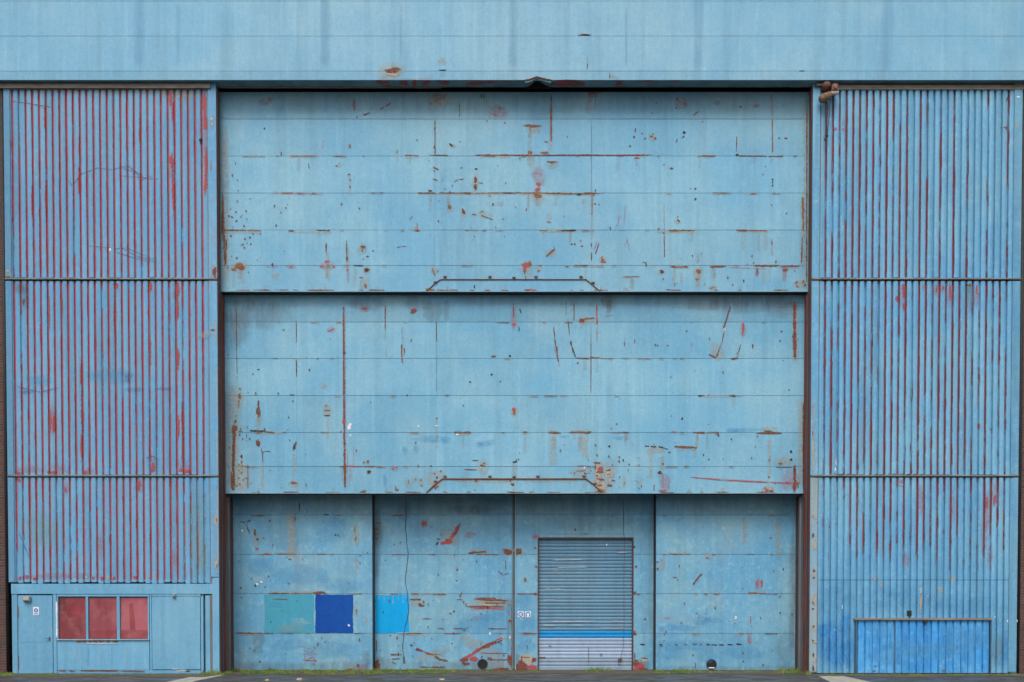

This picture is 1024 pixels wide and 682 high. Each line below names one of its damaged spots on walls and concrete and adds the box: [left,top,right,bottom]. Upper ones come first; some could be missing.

rust [376,69,449,104]
rust [477,79,660,156]
rust [418,189,604,208]
rust [317,229,385,291]
rust [326,307,385,493]
rust [230,420,286,490]
peeling [574,444,709,491]
peeling [431,524,508,644]
peeling [460,628,511,665]